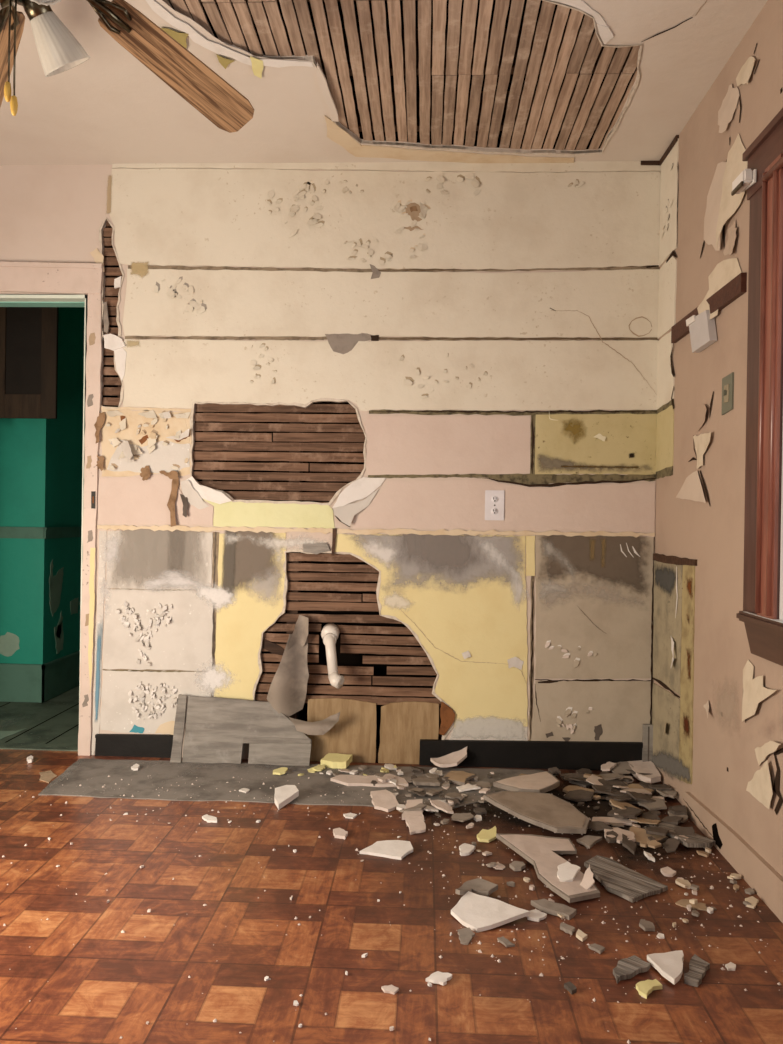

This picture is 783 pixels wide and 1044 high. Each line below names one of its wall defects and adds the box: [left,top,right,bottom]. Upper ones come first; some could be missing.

flaking render [163,0,642,259]
flaking render [86,218,455,776]